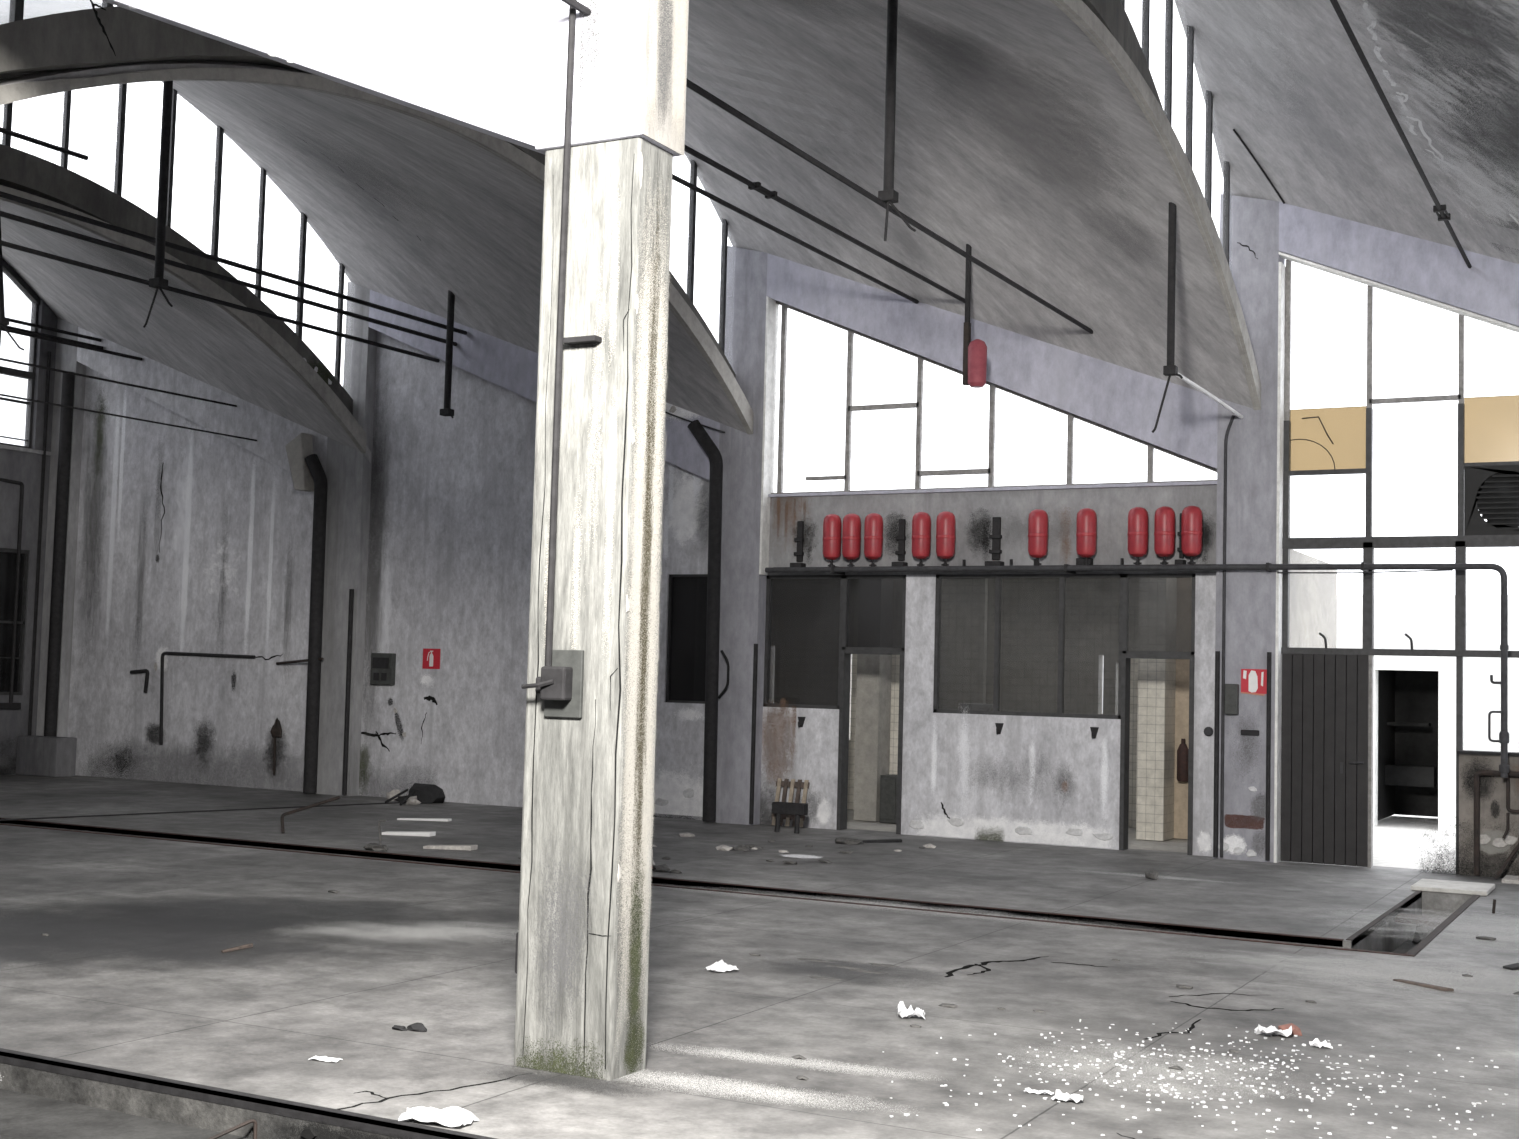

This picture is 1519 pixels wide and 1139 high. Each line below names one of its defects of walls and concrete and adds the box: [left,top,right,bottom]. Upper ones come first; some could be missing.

leakage [48,223,233,331]
leakage [76,376,127,664]
leakage [131,418,196,668]
leakage [216,459,295,684]
leakage [359,370,441,798]
leakage [471,0,942,1097]
leakage [79,719,304,792]
leakage [0,820,595,1050]
crack [945,956,1105,977]
leakage [1414,808,1519,878]